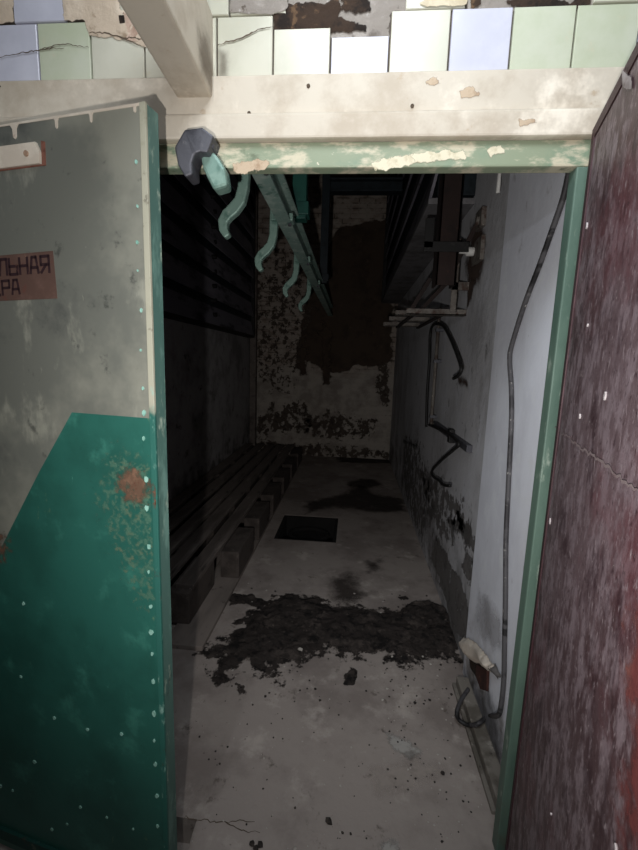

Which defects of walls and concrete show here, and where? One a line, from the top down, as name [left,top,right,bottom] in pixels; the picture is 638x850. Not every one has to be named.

spalling [420,0,592,11]
spalling [62,0,146,47]
spalling [230,0,406,38]
peeling [233,159,269,174]
peeling [372,149,466,171]
peeling [487,145,505,157]
peeling [256,243,390,460]